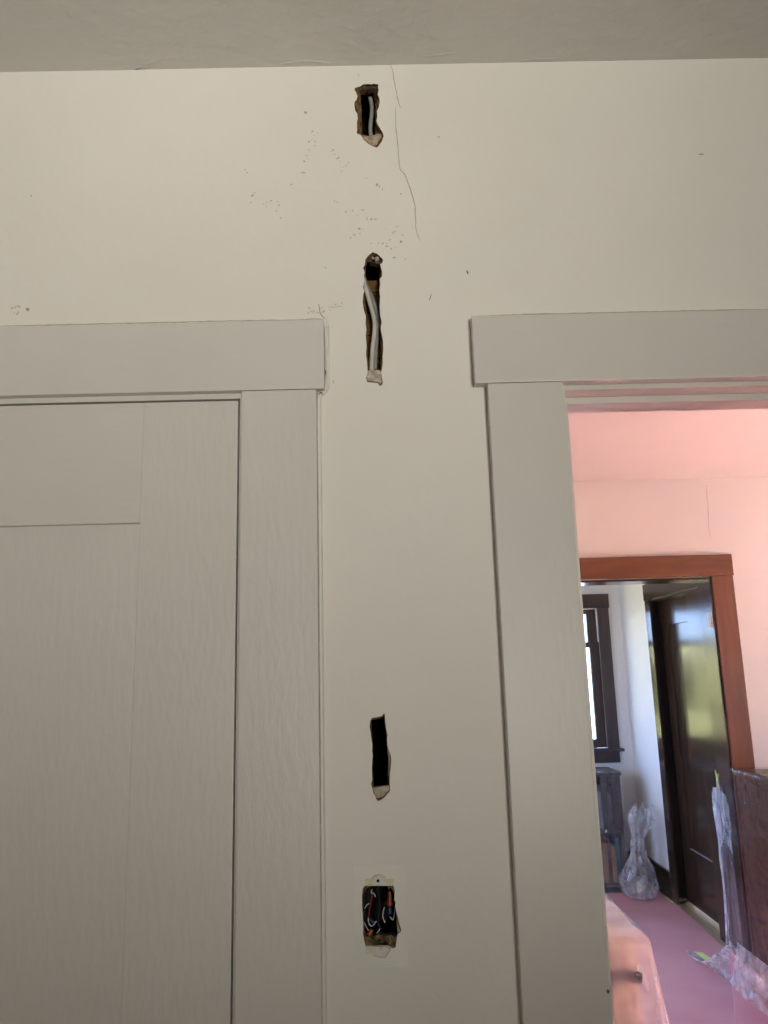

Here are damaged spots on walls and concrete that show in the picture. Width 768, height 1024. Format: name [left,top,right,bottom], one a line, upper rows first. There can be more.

crack [390,65,420,240]